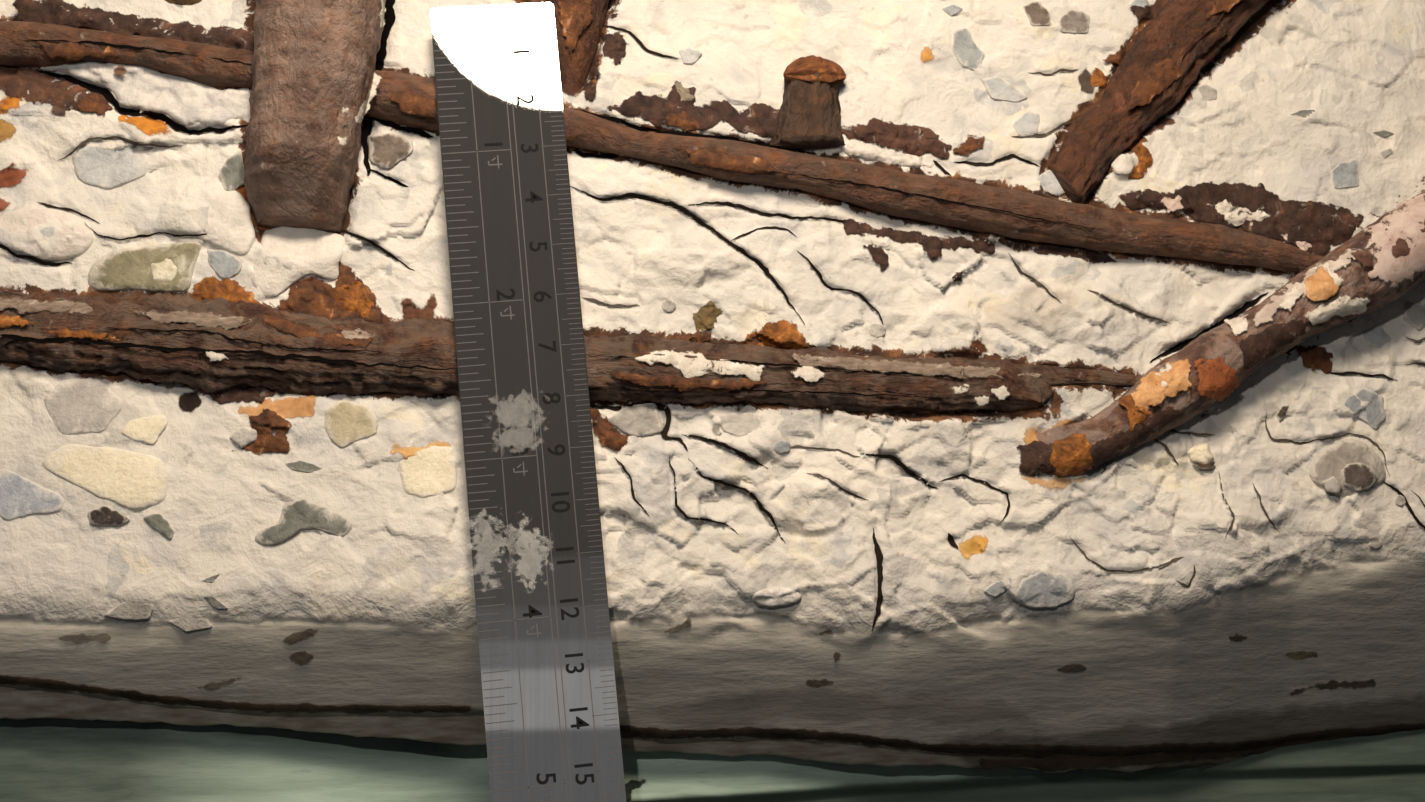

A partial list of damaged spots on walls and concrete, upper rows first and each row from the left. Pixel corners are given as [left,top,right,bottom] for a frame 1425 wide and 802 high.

corrosion [0,0,255,142]
spalling [42,0,256,50]
spalling [0,62,454,323]
corrosion [516,0,780,138]
crack [570,108,883,325]
corrosion [843,218,1115,270]
spalling [561,0,1425,255]
corrosion [1119,138,1373,301]
spalling [0,360,477,665]
crack [590,401,1010,632]
spalling [566,146,1425,636]
crack [1265,414,1425,529]